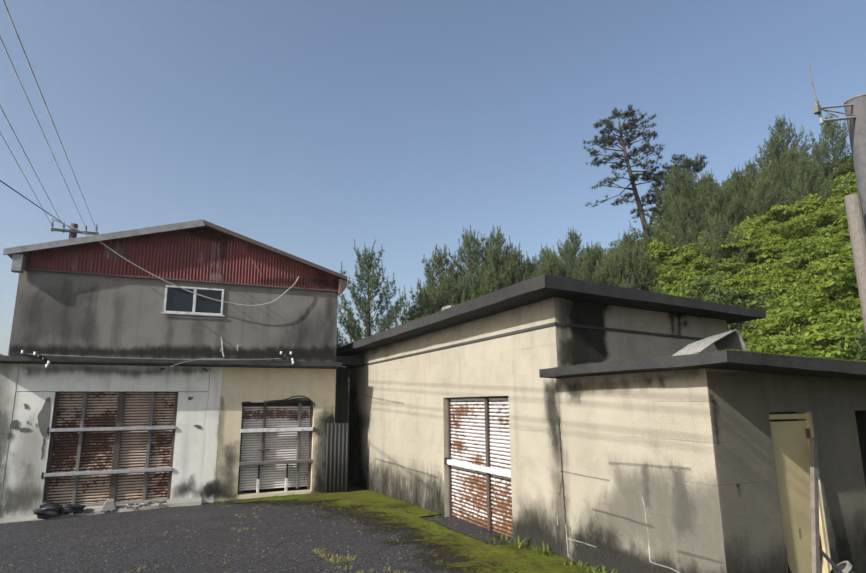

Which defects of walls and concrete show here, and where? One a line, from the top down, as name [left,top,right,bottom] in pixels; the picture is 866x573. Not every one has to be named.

water stain [560,299,608,366]
peeling [7,397,51,440]
water stain [545,383,587,443]
water stain [0,488,39,512]
water stain [512,515,698,573]
water stain [726,552,788,573]
water stain [830,531,866,573]